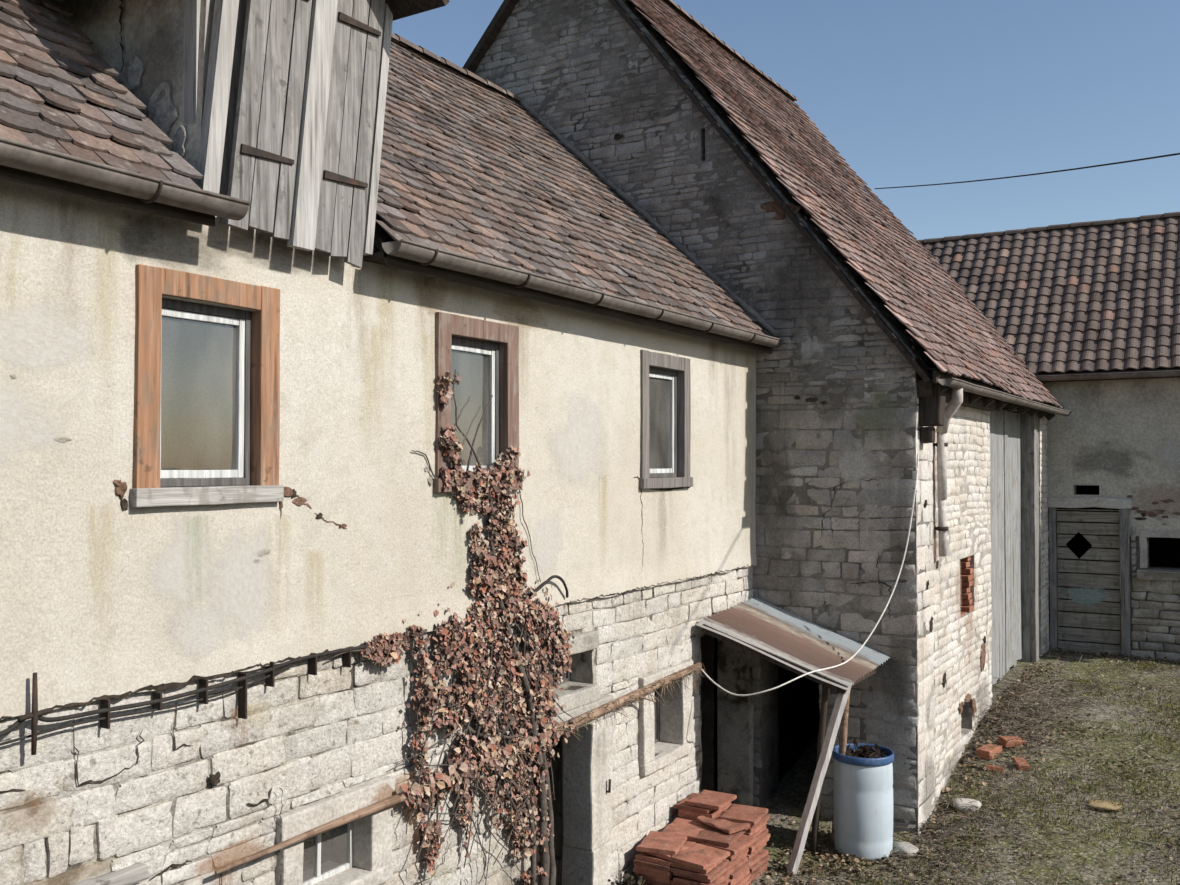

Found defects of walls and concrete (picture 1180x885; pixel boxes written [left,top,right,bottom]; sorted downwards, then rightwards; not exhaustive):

spalling [1126,495,1180,526]
crack [172,726,193,751]
crack [74,729,145,786]
crack [247,787,283,885]
crack [149,860,192,881]